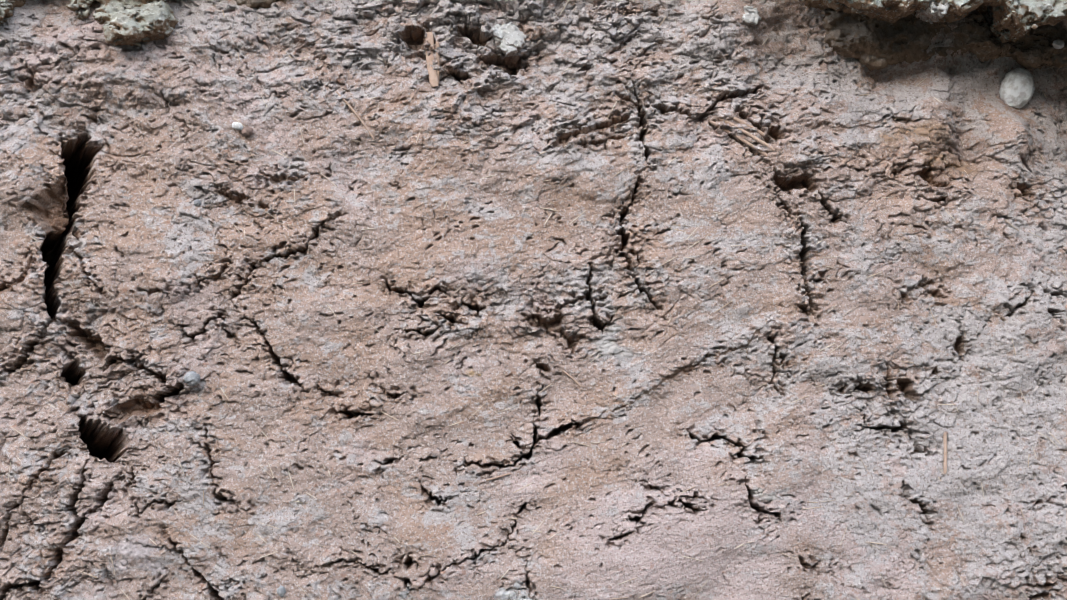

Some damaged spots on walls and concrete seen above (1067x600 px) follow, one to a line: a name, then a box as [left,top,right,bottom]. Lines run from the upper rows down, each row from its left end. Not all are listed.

crack [537,82,769,331]
crack [1,200,109,372]
crack [384,280,482,336]
crack [462,188,846,476]
crack [0,449,177,600]
crack [142,539,239,600]
crack [205,426,250,512]
crack [421,487,447,504]
crack [422,504,532,593]
crack [609,480,700,541]
crack [689,430,781,522]